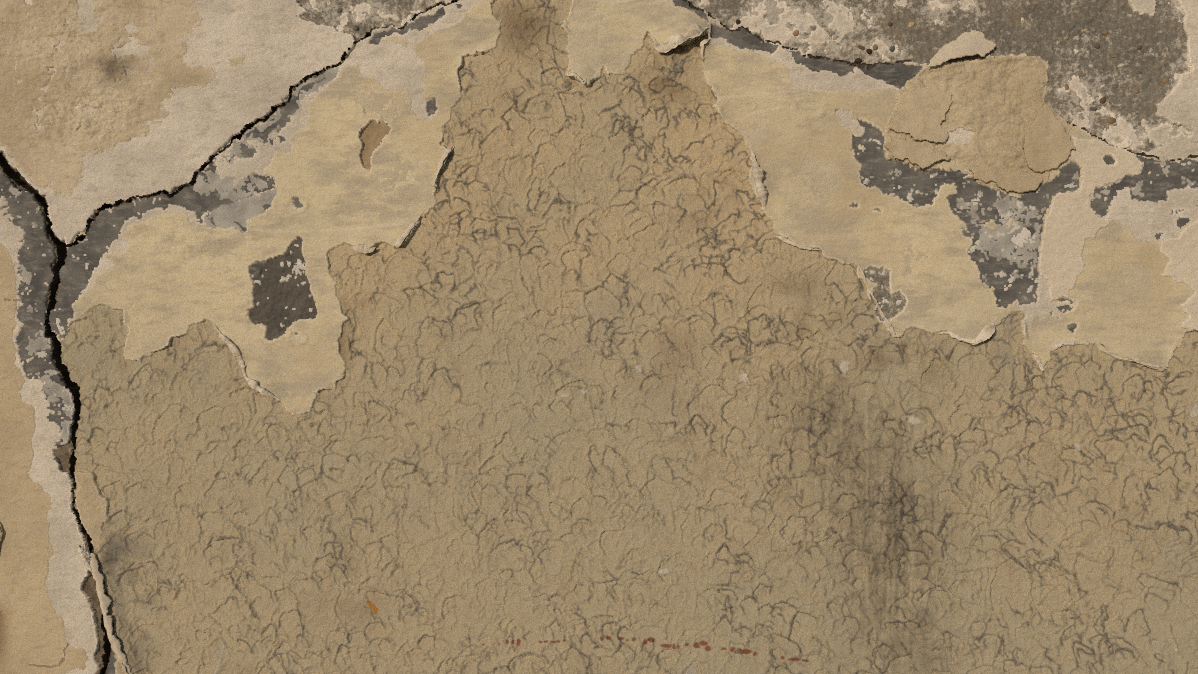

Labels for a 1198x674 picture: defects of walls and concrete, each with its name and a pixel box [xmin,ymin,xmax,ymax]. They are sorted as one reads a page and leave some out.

crack [0,0,458,553]
peeling [0,0,502,674]
crack [683,0,912,70]
peeling [561,0,1198,372]
crack [29,643,70,668]
crack [99,614,115,674]